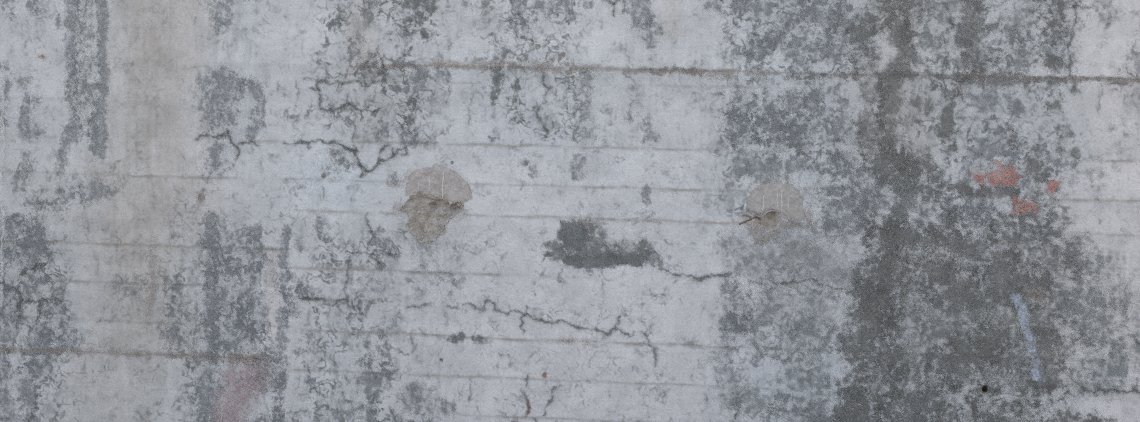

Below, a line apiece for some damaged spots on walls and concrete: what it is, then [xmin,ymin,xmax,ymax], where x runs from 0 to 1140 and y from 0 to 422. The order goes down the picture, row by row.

crack [195,47,412,177]
water stain [649,66,696,75]
spalling [399,161,472,244]
spalling [739,180,806,233]
water stain [705,0,1140,422]
crack [407,300,657,366]